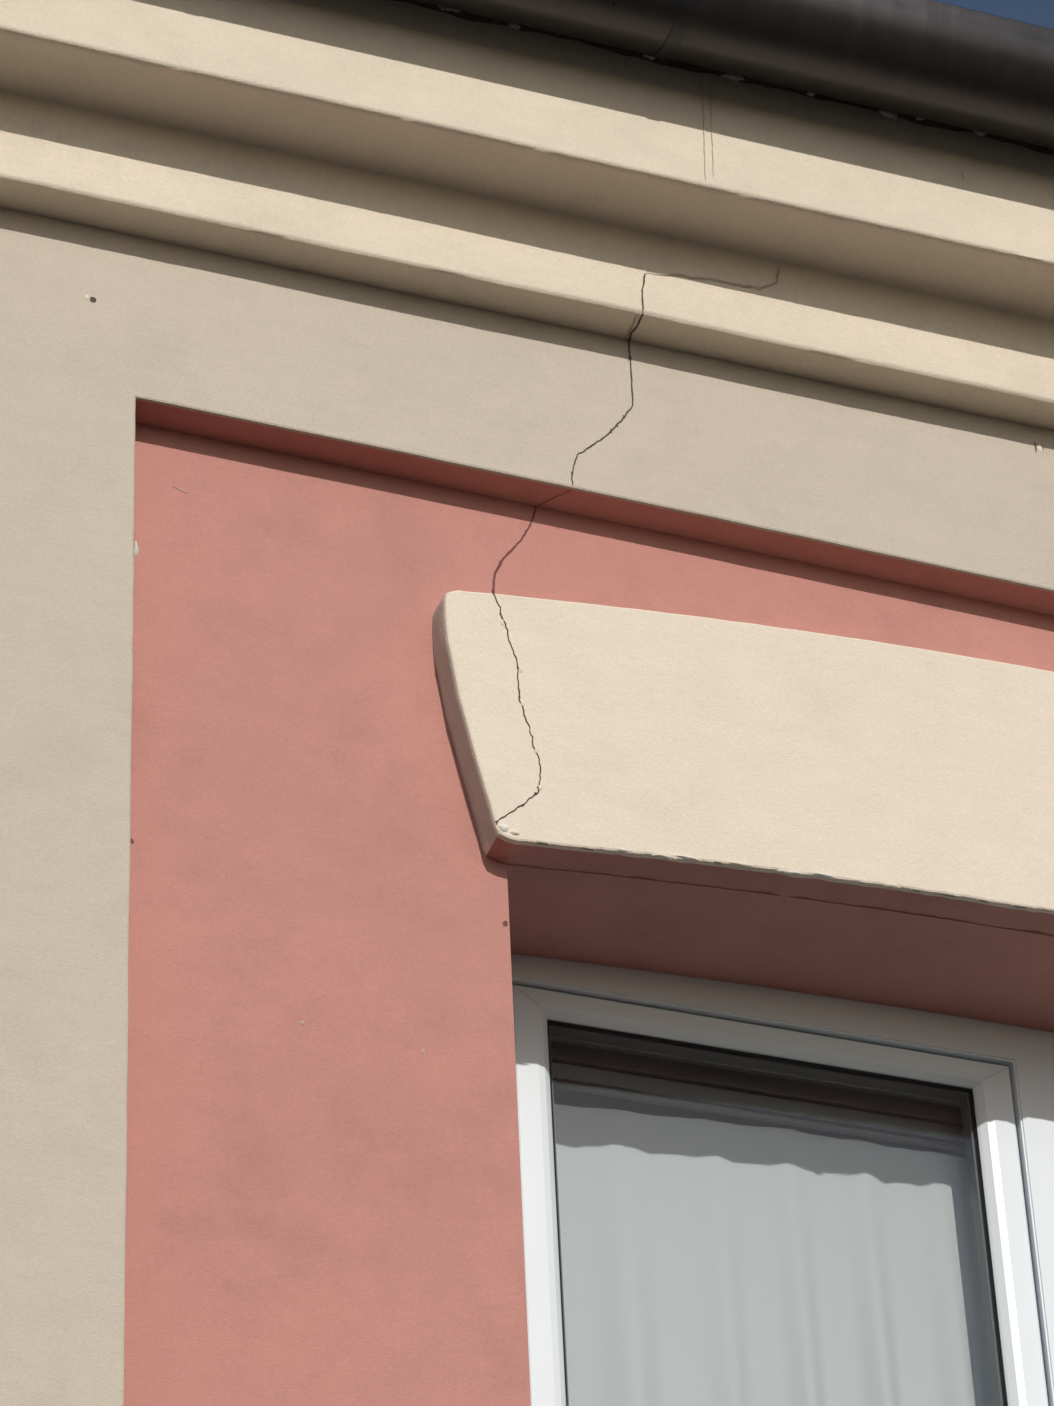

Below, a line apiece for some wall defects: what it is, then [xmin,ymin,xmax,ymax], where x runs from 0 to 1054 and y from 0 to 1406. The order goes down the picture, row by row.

crack [492,265,780,822]